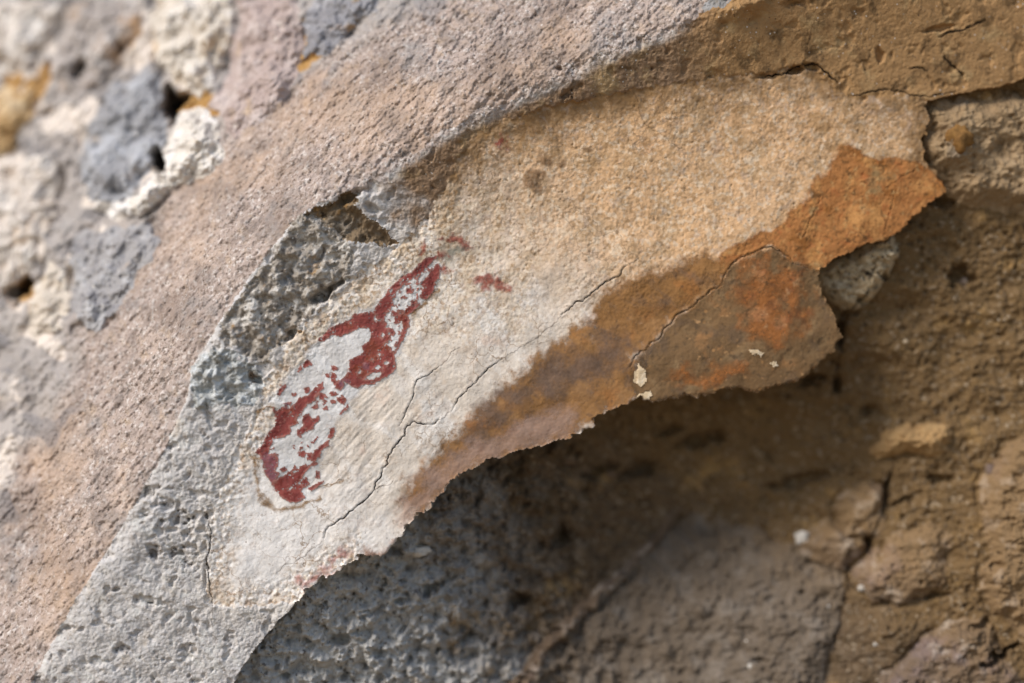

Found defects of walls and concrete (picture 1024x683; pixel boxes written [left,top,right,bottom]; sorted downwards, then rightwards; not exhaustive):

crack [766,20,985,97]
peeling [189,190,441,510]
crack [284,259,637,565]
peeling [633,363,653,399]
crack [630,197,820,366]